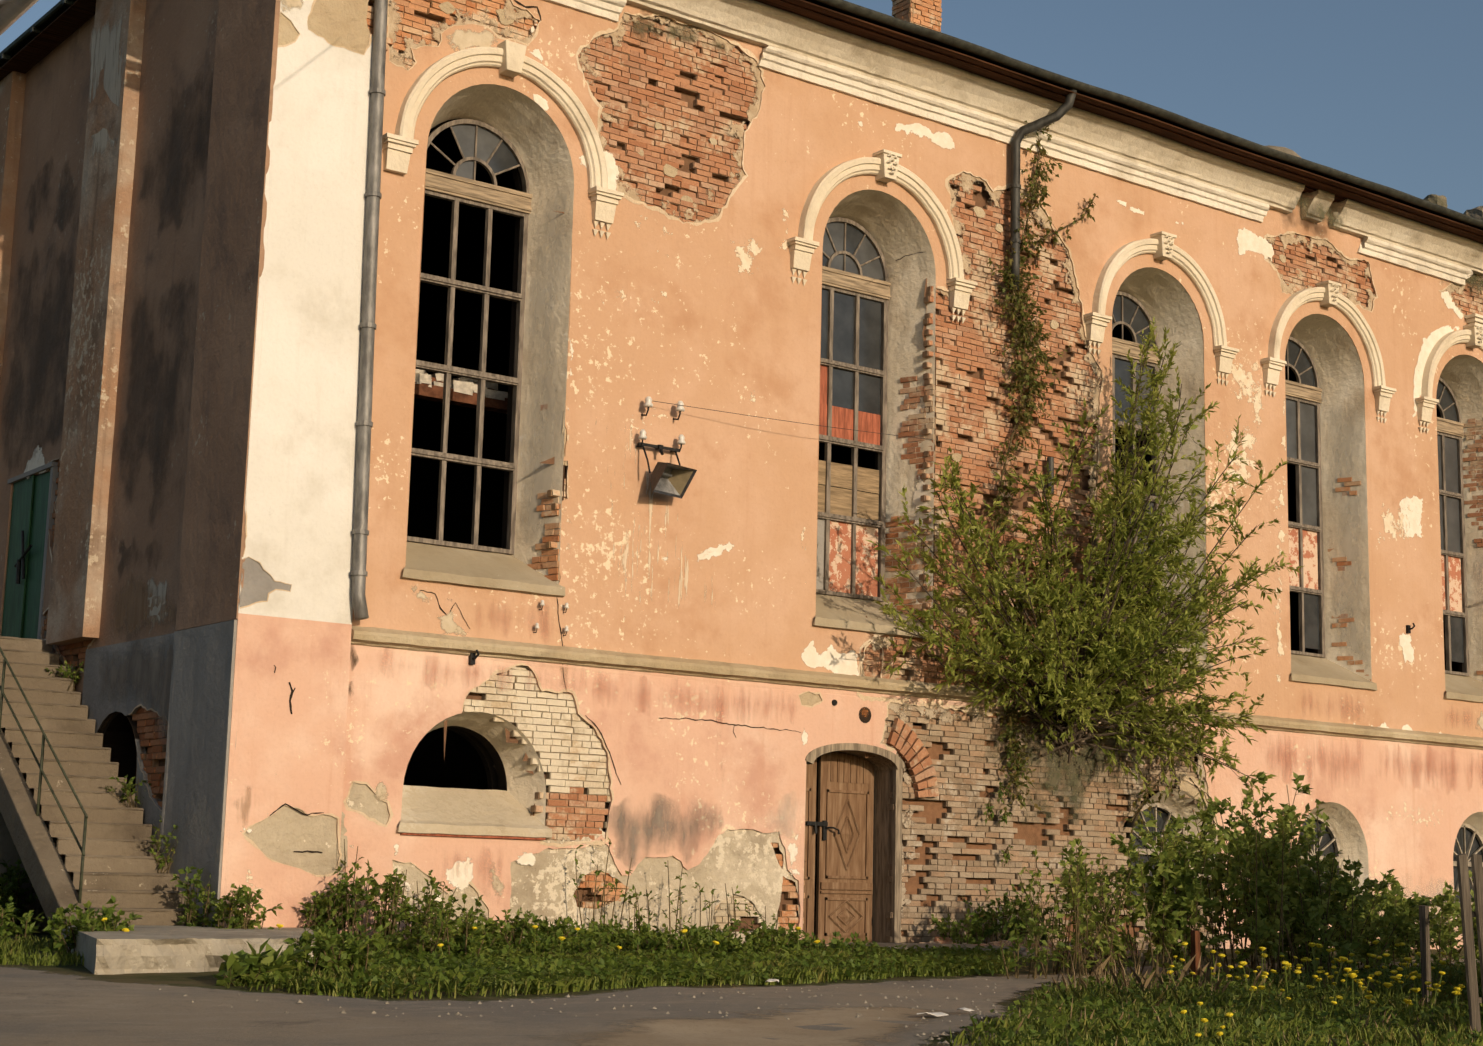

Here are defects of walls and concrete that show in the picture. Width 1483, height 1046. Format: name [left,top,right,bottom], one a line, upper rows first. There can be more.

water stain [90,19,124,106]
spalling [278,0,543,71]
spalling [576,12,766,235]
water stain [6,263,72,445]
water stain [123,290,184,480]
spalling [1413,274,1483,417]
peeling [239,501,292,609]
spalling [798,171,1219,950]
peeling [1378,496,1423,544]
spalling [1463,419,1483,547]
peeling [240,781,394,880]
peeling [392,663,806,944]